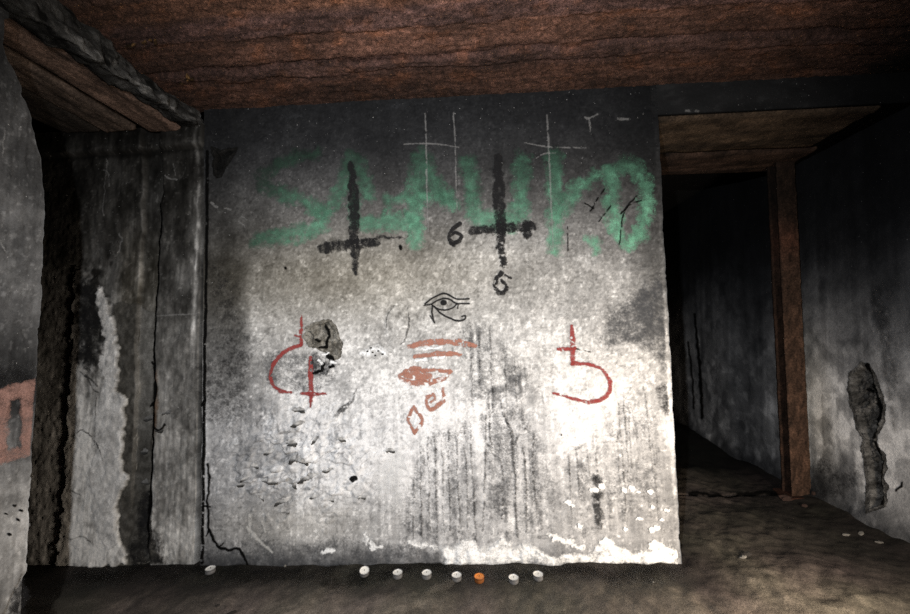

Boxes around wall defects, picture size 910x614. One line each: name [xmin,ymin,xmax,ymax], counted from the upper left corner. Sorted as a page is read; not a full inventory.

flaking render [89,287,171,564]
crack [147,203,166,548]
crack [200,150,248,565]
spalling [302,319,343,374]
damp [471,331,522,405]
damp [363,412,678,576]
spalling [847,361,889,514]